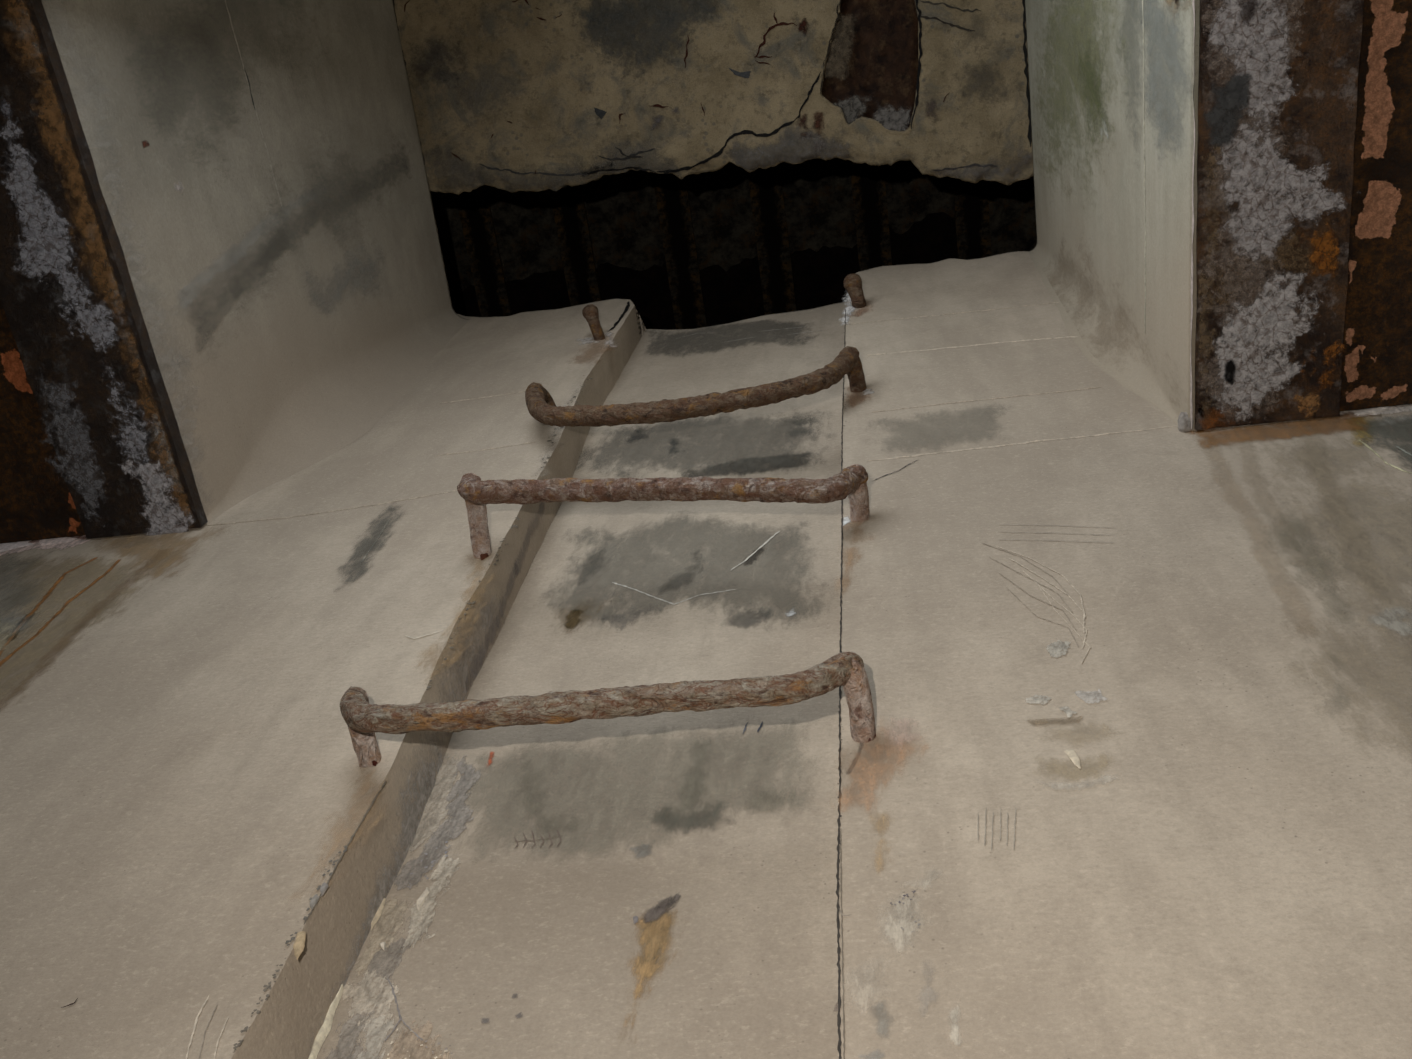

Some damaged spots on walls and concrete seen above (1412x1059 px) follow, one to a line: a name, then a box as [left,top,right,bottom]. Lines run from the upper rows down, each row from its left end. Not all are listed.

crack [587,0,849,174]
spalling [818,0,936,136]
crack [911,0,981,129]
crack [1022,0,1032,147]
peeling [1361,0,1408,159]
peeling [1355,180,1402,239]
peeling [1339,328,1412,417]
water stain [345,508,394,579]
water stain [731,532,779,570]